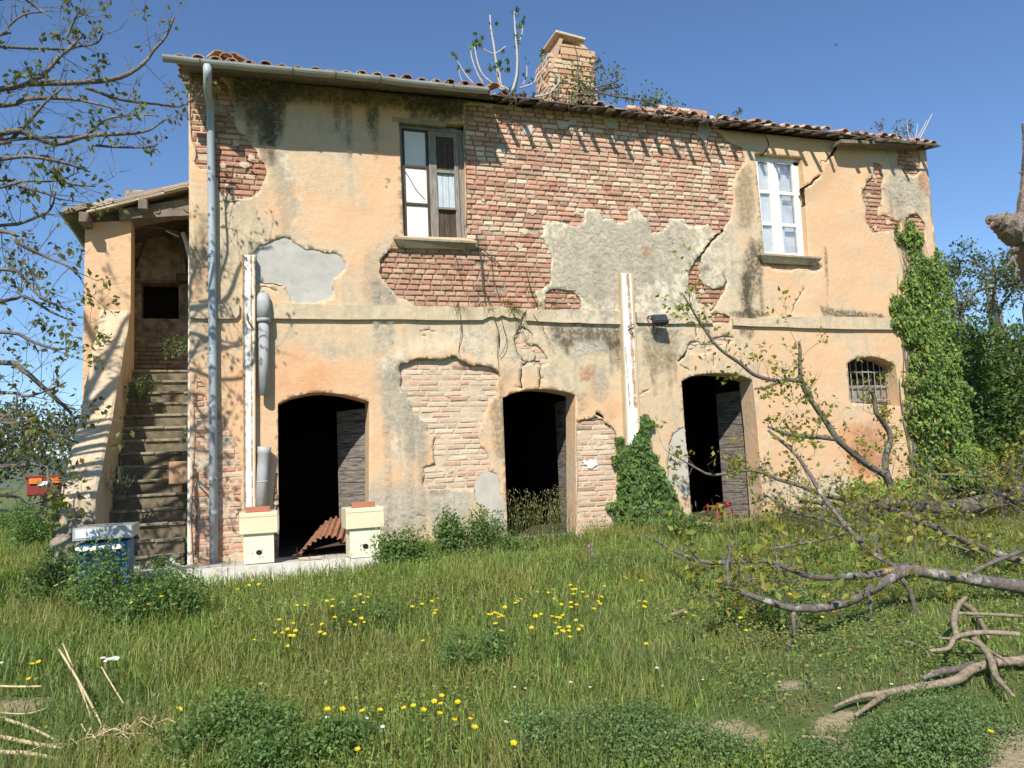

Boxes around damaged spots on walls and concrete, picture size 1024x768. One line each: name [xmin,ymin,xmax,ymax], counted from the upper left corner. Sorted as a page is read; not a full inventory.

peeling [189,74,267,199]
water stain [233,78,467,221]
peeling [379,105,744,310]
crack [799,138,843,207]
peeling [862,163,925,237]
peeling [894,149,920,176]
peeling [255,237,346,303]
peeling [684,257,733,354]
peeling [399,356,506,532]
peeling [576,417,617,533]